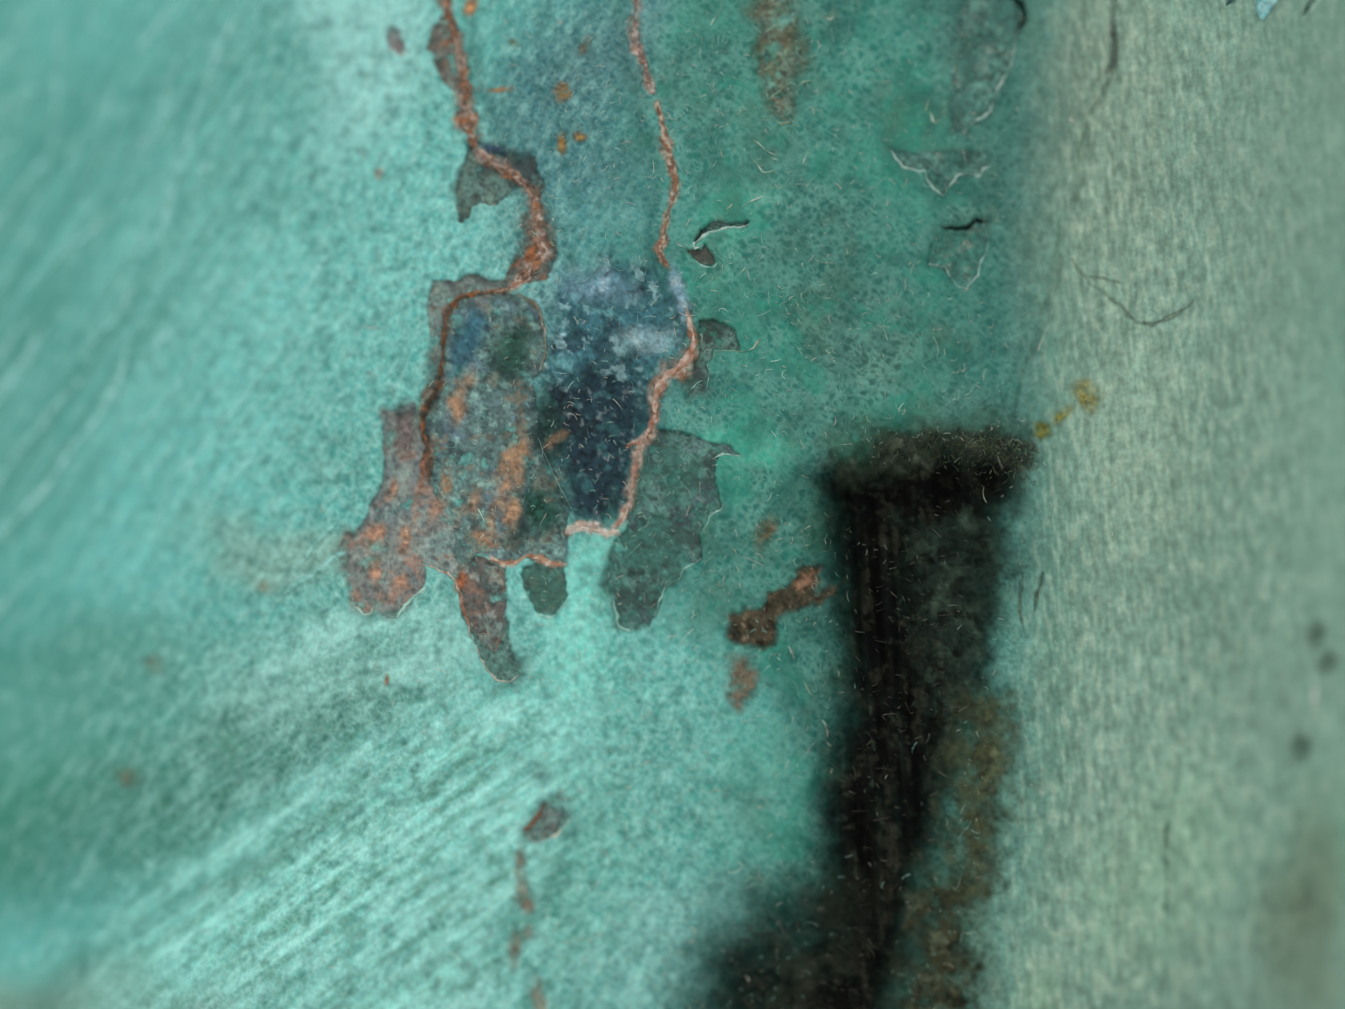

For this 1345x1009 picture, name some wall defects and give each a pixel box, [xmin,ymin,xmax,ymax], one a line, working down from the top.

peeling [387,29,407,56]
spalling [427,17,460,91]
peeling [925,0,1026,135]
crack [1068,20,1118,123]
peeling [889,149,996,196]
peeling [688,182,763,277]
peeling [915,219,997,299]
peeling [683,320,786,396]
peeling [343,145,743,683]
water stain [945,696,1016,907]